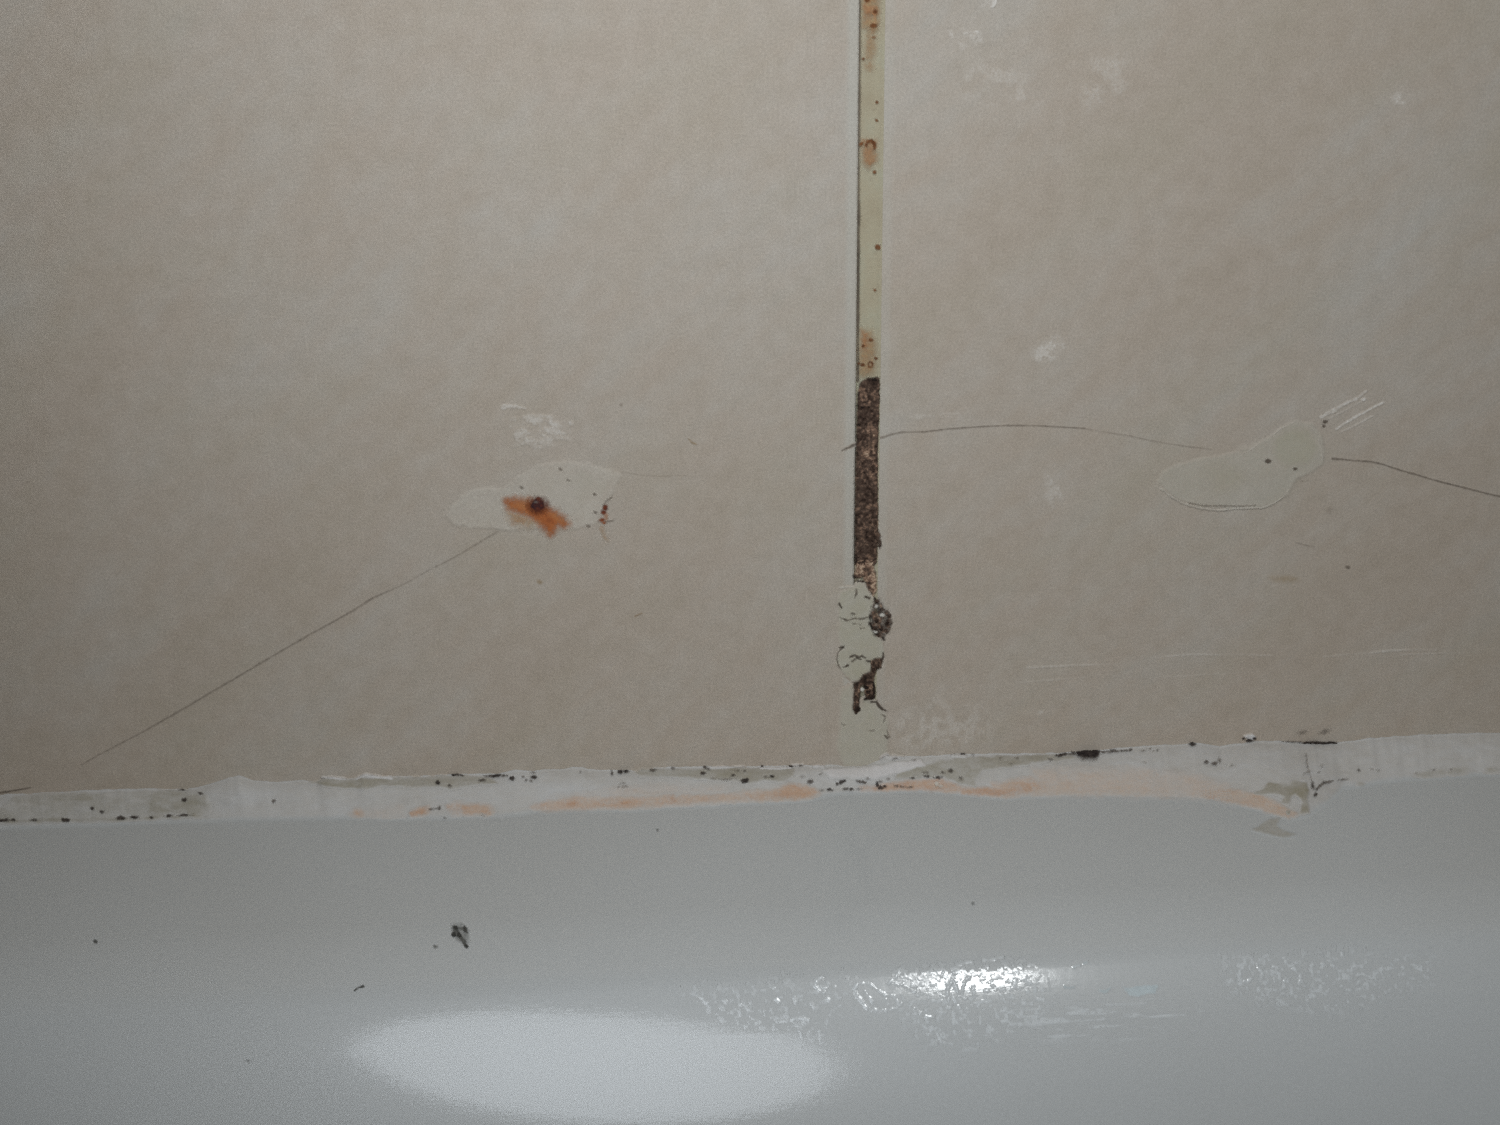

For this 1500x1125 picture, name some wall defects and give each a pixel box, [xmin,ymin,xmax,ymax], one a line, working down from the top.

rust [862,0,878,60]
rust [860,139,876,174]
crack [840,423,1213,452]
crack [1330,456,1500,498]
rust [504,497,567,536]
crack [80,530,500,766]
water stain [90,789,203,820]
water stain [347,772,537,822]
water stain [527,749,1300,823]
peeling [1250,779,1311,839]
water stain [1286,730,1366,796]